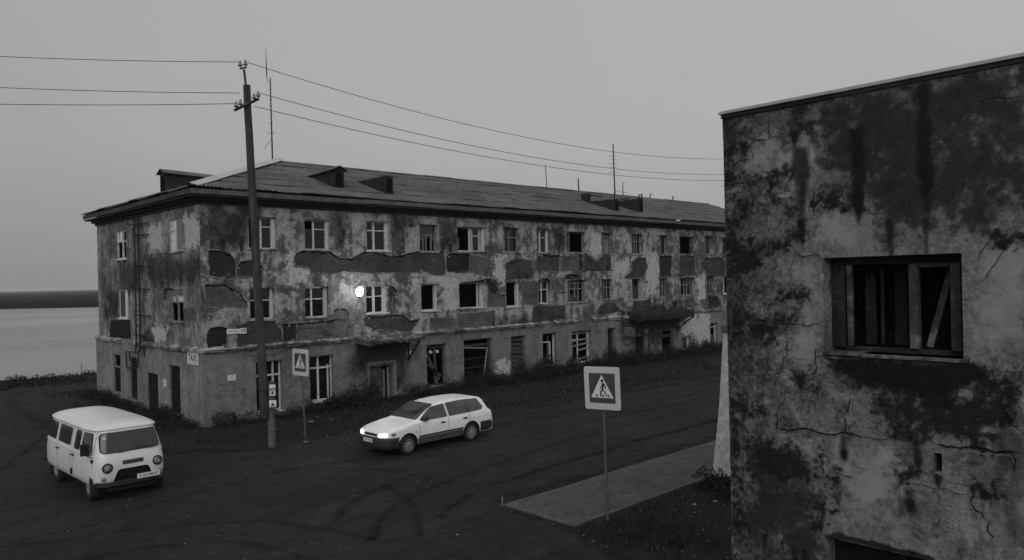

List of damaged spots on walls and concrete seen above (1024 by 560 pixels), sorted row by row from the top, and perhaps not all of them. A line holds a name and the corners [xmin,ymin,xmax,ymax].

damp [724,64,1024,279]
flaking render [182,206,263,309]
peeling [206,321,297,350]
flaking render [282,228,726,346]
crack [978,226,1024,280]
damp [822,355,1024,512]
crack [900,481,993,546]